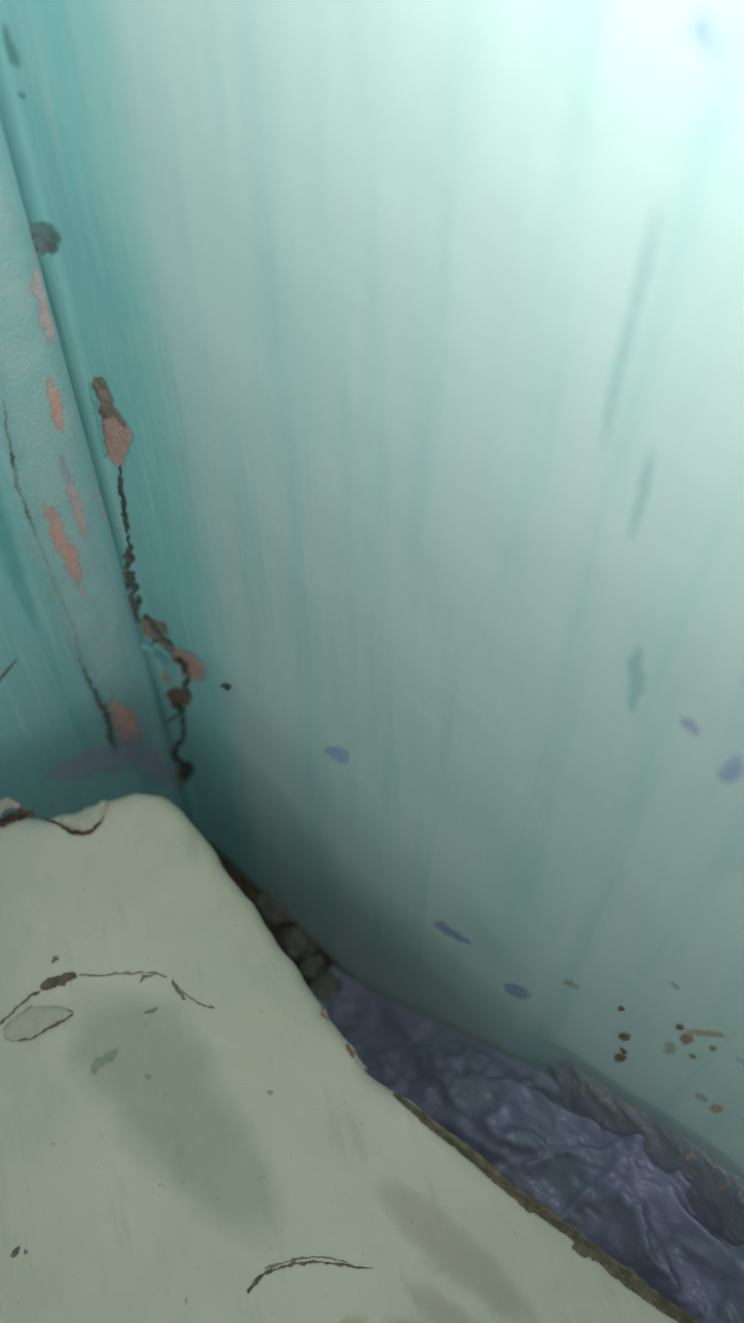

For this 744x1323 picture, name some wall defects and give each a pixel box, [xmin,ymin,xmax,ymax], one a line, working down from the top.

peeling [47,380,63,431]
peeling [89,376,132,467]
peeling [45,469,106,595]
crack [3,401,121,759]
crack [117,466,192,777]
spalling [139,617,205,713]
peeling [109,700,141,740]
peeling [0,796,108,835]
crack [0,971,214,1025]
rust [614,1033,629,1062]
rust [676,1025,723,1059]
crack [247,1256,371,1293]